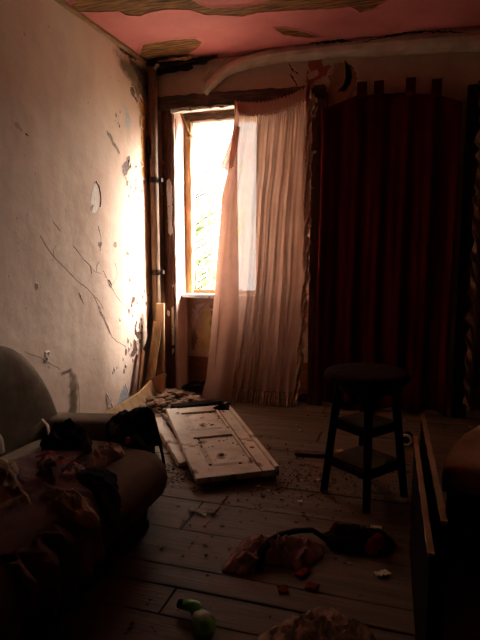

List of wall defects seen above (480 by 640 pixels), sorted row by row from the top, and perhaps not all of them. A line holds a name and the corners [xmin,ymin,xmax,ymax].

spalling [67,0,390,17]
leakage [120,47,148,101]
spalling [136,36,205,70]
spalling [273,26,326,39]
flaking render [304,60,360,107]
spalling [121,85,149,212]
flaking render [90,180,101,214]
crack [41,237,128,347]
spalling [123,284,149,373]
leakage [62,369,79,413]